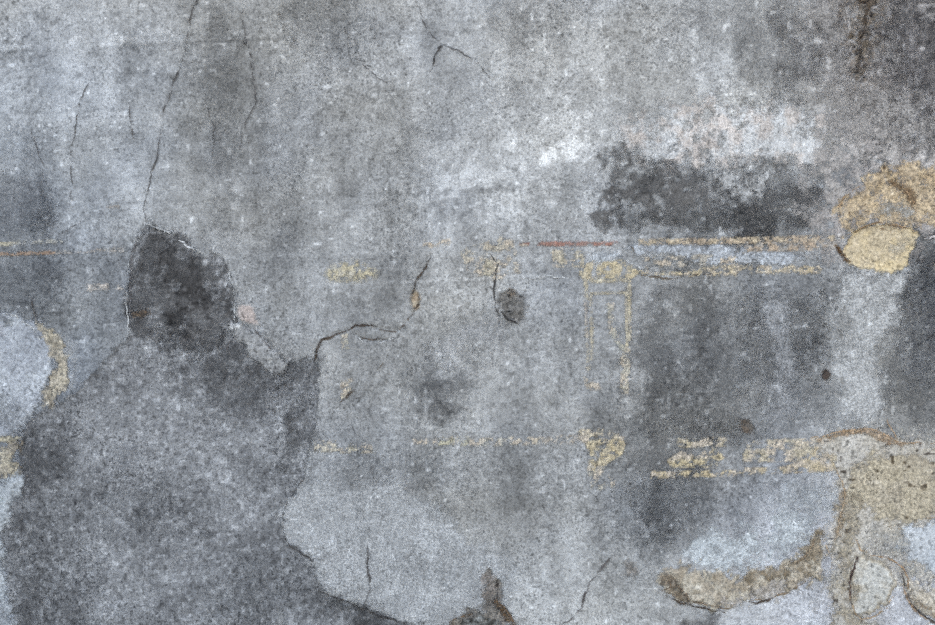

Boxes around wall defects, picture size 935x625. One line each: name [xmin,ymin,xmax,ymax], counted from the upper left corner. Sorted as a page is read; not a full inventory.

crack [143,139,160,219]
crack [239,9,257,149]
water stain [589,0,935,263]
water stain [123,225,267,405]
crack [314,257,431,369]
spalling [461,161,935,393]
water stain [765,300,809,434]
water stain [823,268,906,434]
water stain [278,479,519,625]
spalling [450,569,515,625]
spalling [651,420,935,625]